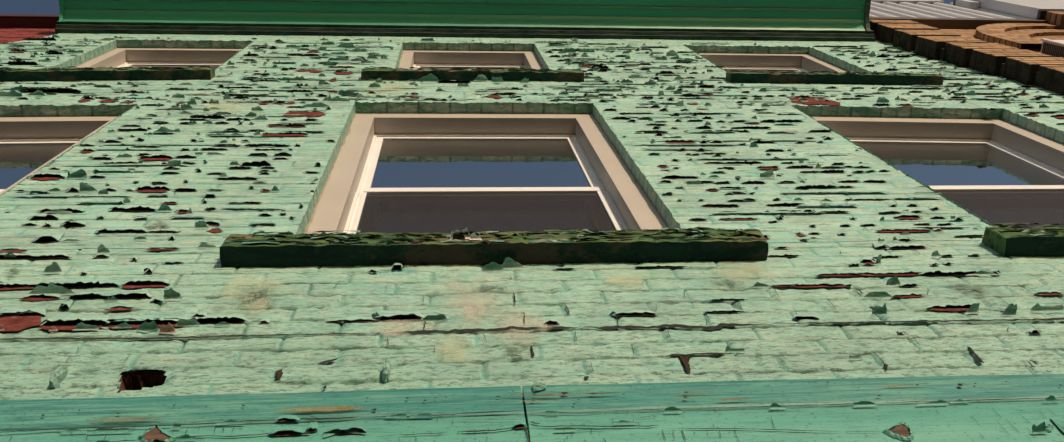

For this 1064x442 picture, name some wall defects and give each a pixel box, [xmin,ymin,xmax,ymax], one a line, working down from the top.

peeling [0,35,1064,333]
spalling [117,371,167,393]
peeling [138,424,196,442]
peeling [882,422,914,441]
peeling [1032,421,1053,434]